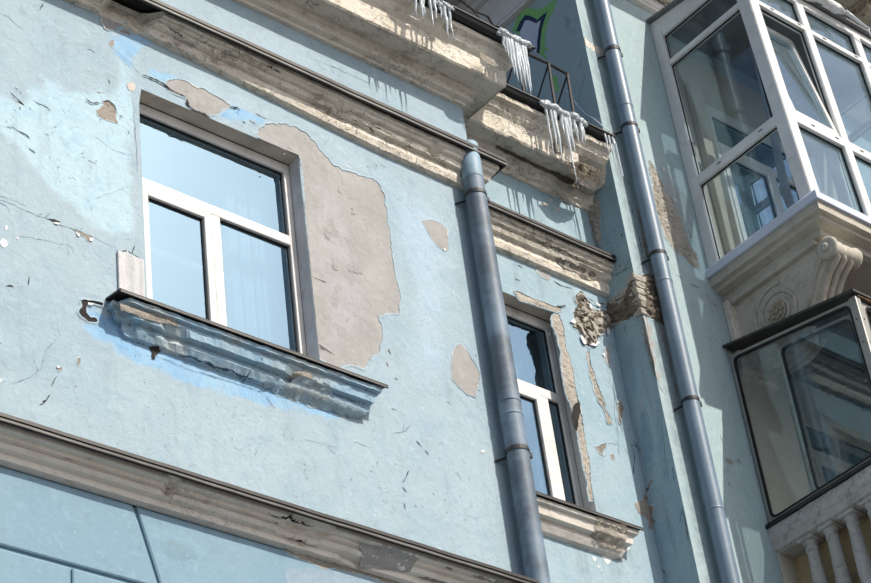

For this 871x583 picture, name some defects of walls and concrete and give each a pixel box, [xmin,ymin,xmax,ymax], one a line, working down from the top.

flaking render [87,92,123,124]
flaking render [144,75,240,118]
crack [0,196,73,255]
flaking render [242,113,403,372]
flaking render [413,216,459,252]
flaking render [647,159,700,270]
flaking render [119,302,180,327]
flaking render [450,343,480,399]
flaking render [513,208,680,502]
flaking render [635,477,657,530]
flaking render [283,549,399,583]
flaking render [588,516,630,571]